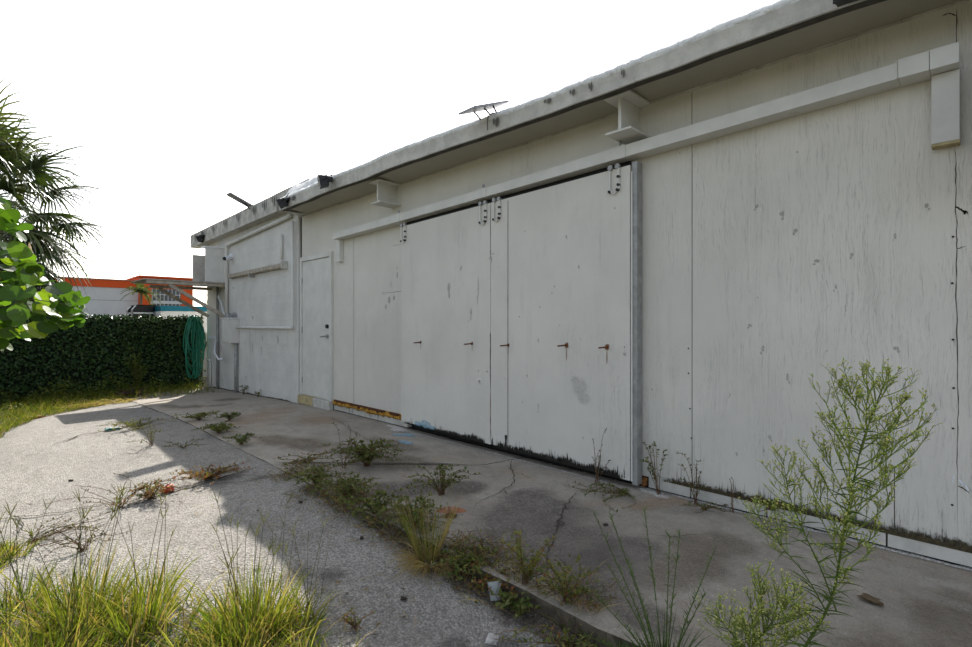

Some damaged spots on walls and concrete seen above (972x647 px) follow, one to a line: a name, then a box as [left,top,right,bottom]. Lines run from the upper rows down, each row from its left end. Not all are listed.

crack [955,152,969,493]
damp [405,422,625,479]
crack [535,492,577,578]